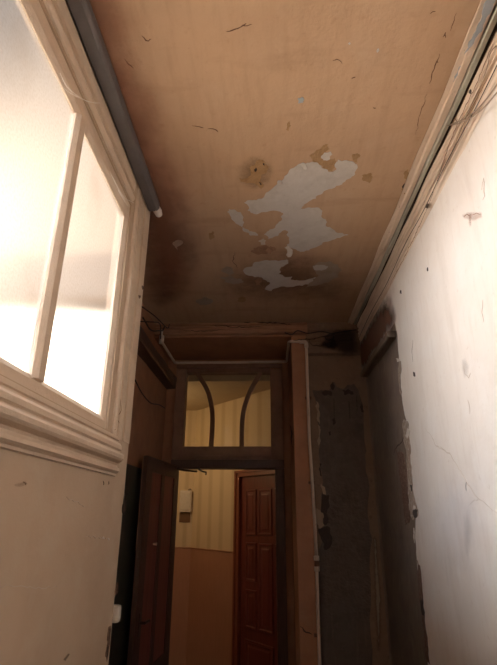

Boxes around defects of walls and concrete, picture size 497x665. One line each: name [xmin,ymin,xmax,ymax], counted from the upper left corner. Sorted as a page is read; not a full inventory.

peeling [228,144,373,291]
flaking render [312,382,373,665]
flaking render [394,419,418,543]